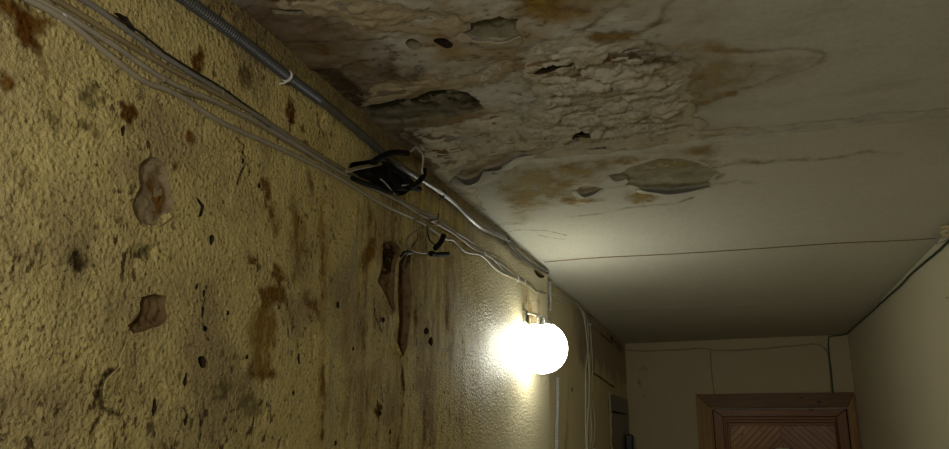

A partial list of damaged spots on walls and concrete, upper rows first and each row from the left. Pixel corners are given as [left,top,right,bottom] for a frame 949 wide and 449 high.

flaking render [270,0,760,211]
water stain [611,52,676,65]
flaking render [132,157,173,227]
peeling [96,294,167,416]
flaking render [378,241,412,359]